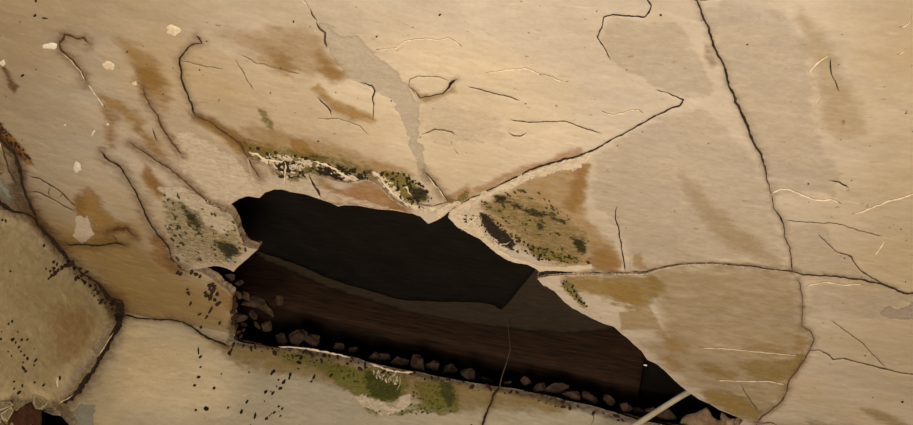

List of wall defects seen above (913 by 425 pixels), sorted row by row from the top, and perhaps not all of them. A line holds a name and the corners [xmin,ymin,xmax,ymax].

corrosion [0,123,31,160]
crack [130,90,222,209]
water stain [199,117,273,152]
water stain [275,140,406,211]
water stain [314,87,373,120]
crack [408,76,684,209]
crack [591,0,913,425]
crack [0,139,230,406]
flaking render [0,331,114,425]
peeling [278,346,350,358]
peeling [354,363,413,416]
water stain [220,344,569,412]